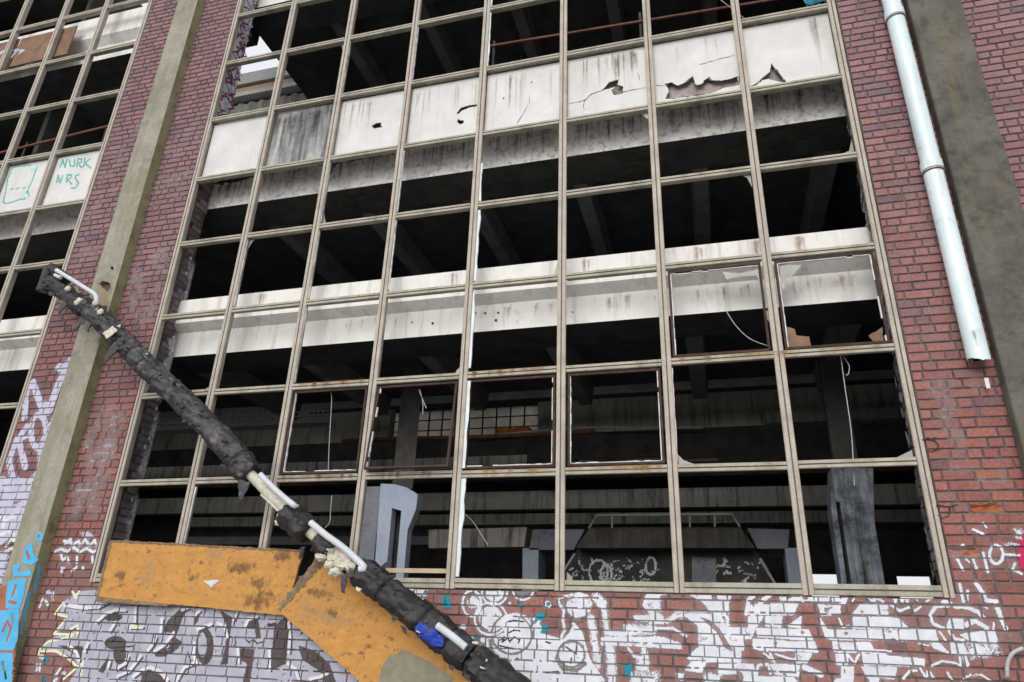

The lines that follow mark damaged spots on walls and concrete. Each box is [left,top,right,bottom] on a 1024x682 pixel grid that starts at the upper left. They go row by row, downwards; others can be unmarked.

spalling [665,63,786,99]